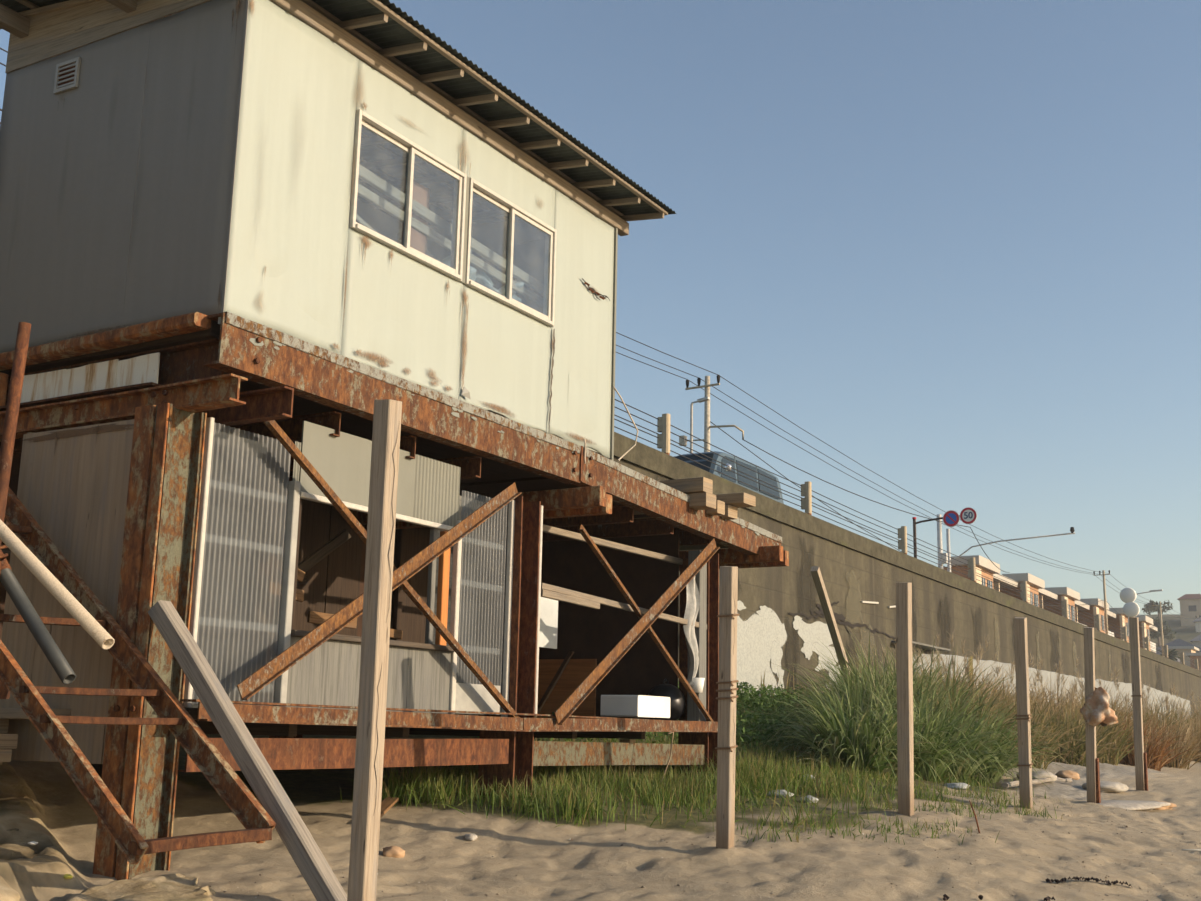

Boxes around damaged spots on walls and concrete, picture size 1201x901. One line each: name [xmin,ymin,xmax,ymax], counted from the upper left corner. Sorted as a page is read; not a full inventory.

peeling [249,338,306,353]
rust [356,350,387,367]
rust [429,282,468,391]
peeling [737,601,846,698]